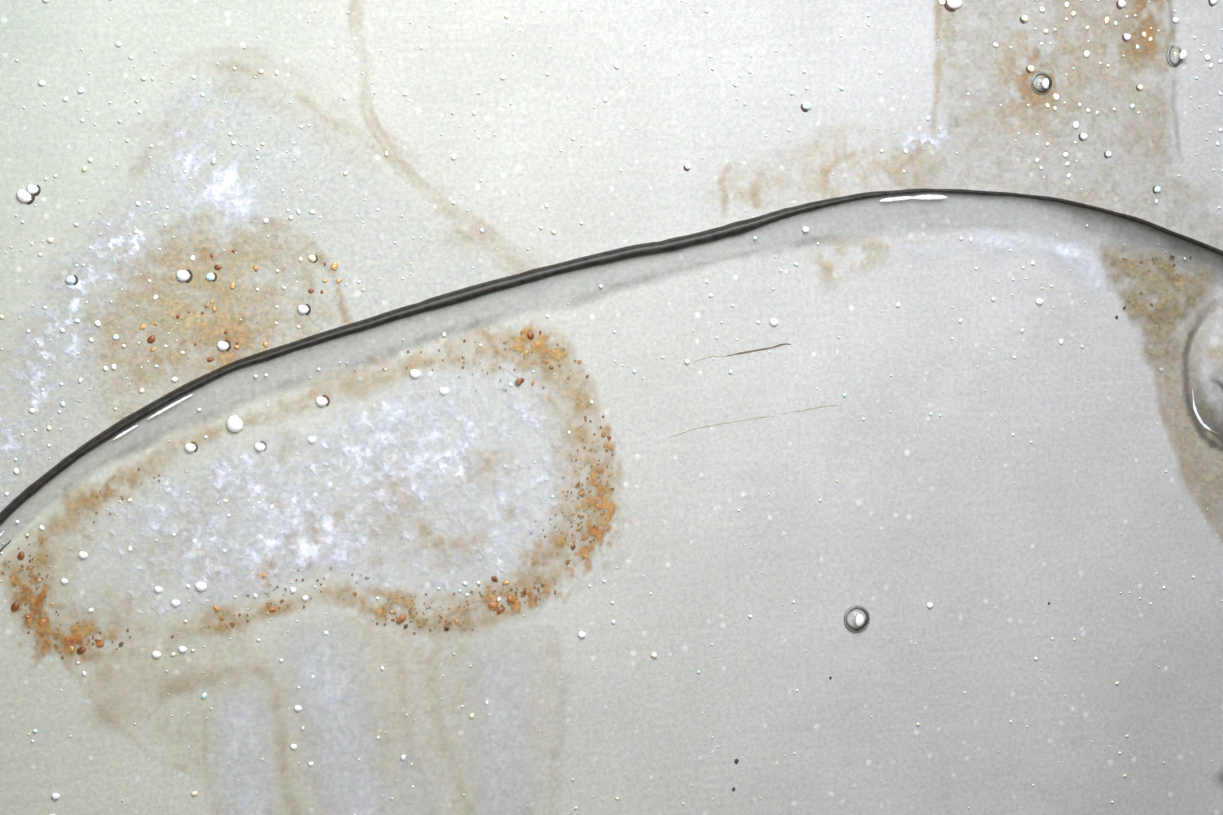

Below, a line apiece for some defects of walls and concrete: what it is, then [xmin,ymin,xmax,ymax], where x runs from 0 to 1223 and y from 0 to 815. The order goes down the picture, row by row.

leakage [1121,0,1156,60]
leakage [1018,71,1053,106]
leakage [171,127,311,219]
leakage [0,210,148,457]
corrosion [124,244,275,380]
corrosion [308,262,342,293]
corrosion [406,327,616,572]
leakage [1166,305,1223,508]
corrosion [2,536,131,660]
corrosion [204,596,249,632]
corrosion [247,567,332,613]
corrosion [343,573,556,634]